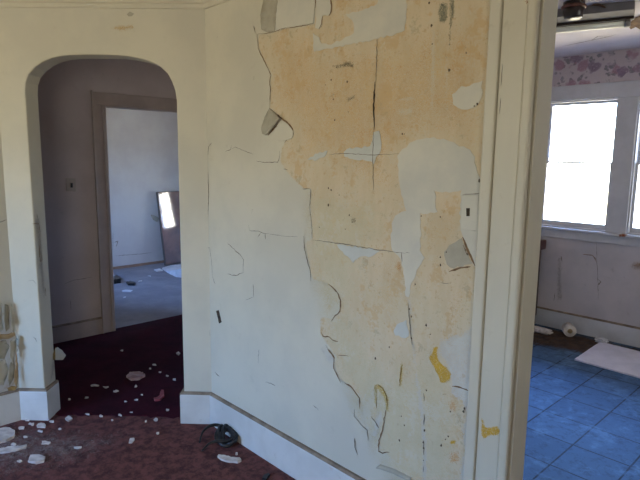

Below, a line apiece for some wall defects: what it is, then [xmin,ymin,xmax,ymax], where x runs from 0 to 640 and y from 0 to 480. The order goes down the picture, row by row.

crack [327,47,391,163]
crack [249,188,408,278]
flaking render [258,0,490,480]
flaking render [0,303,18,392]